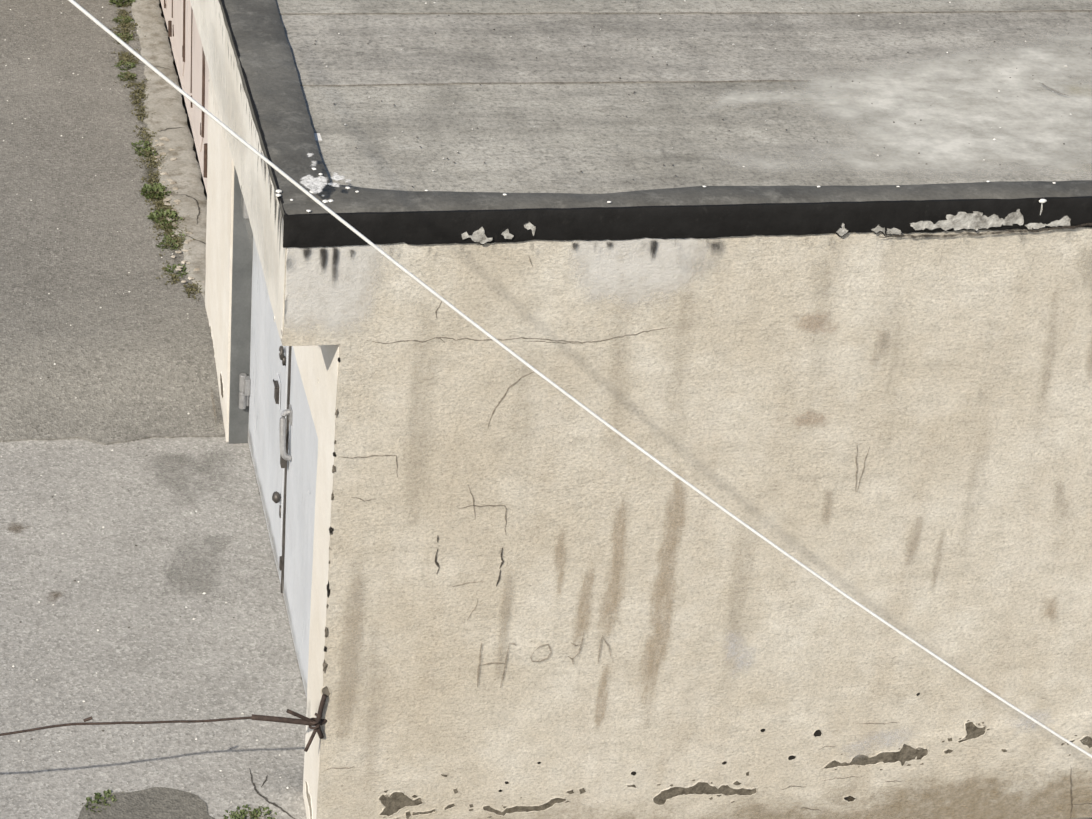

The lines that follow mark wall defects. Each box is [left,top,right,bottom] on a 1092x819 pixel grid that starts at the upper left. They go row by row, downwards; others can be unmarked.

leakage [246,104,384,326]
peeling [460,220,537,245]
peeling [835,222,849,237]
peeling [870,208,1072,236]
crack [367,304,665,344]
flaking render [941,719,990,755]
flaking render [822,743,930,771]
flaking render [378,787,587,819]
flaking render [652,771,758,806]